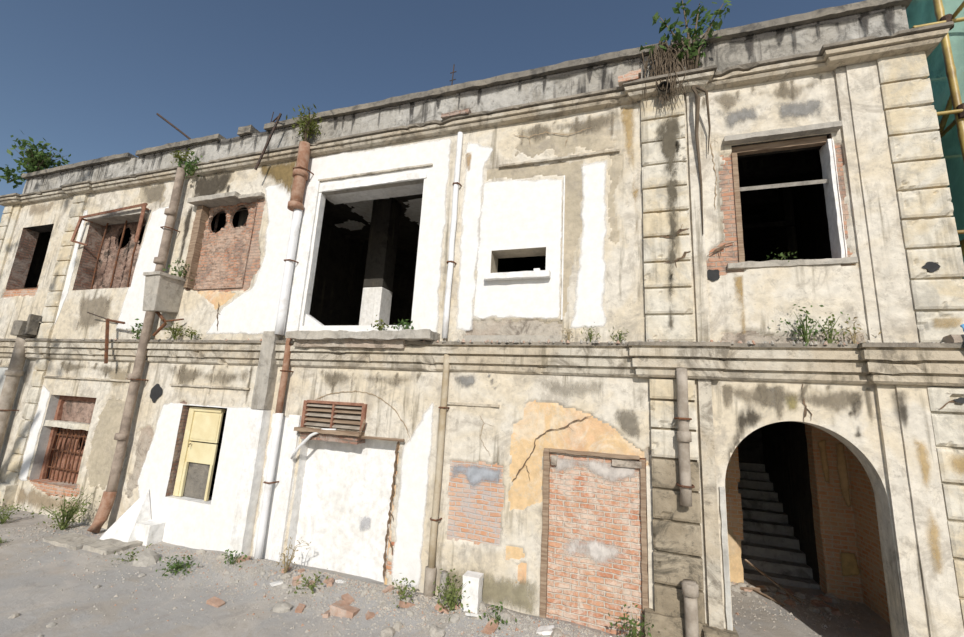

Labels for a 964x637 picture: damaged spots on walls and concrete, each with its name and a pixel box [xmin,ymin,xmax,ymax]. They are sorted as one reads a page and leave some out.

water stain [611,108,633,149]
water stain [657,117,680,291]
flaking render [188,198,266,310]
peeling [28,397,154,499]
crack [512,416,590,482]
water stain [723,385,732,406]
water stain [734,410,760,448]
water stain [757,384,807,417]
water stain [849,388,872,417]
water stain [895,393,908,424]
peeling [447,400,651,583]